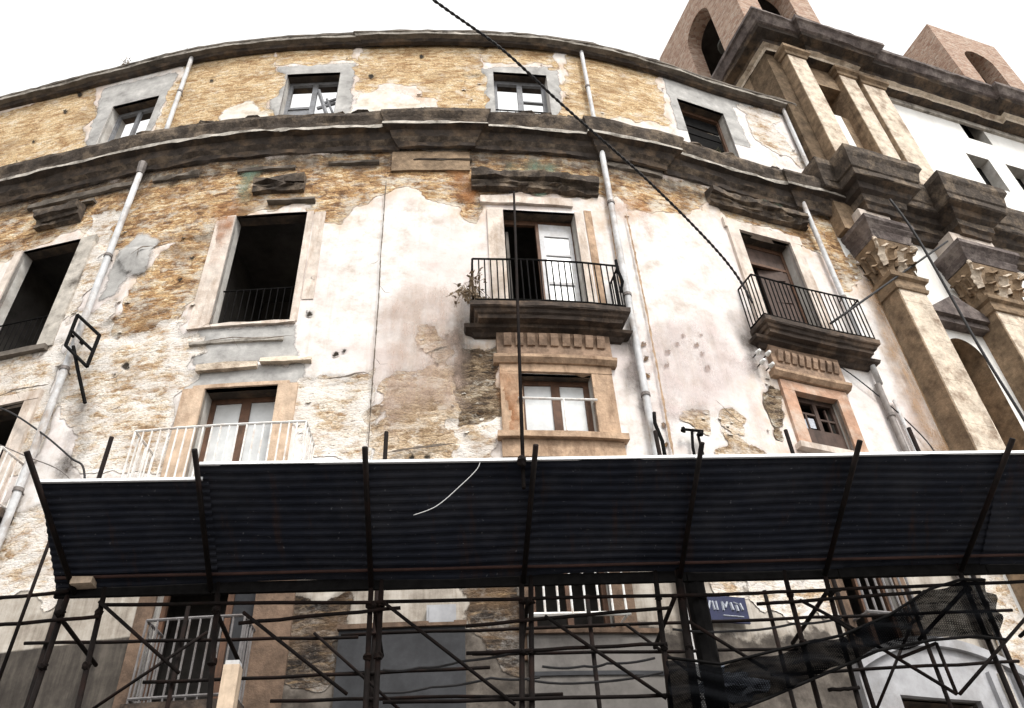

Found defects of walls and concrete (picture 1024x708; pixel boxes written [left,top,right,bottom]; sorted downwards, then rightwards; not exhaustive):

spalling [0,88,98,167]
spalling [155,45,671,130]
flaking render [737,104,806,168]
spalling [720,209,863,293]
spalling [0,149,710,476]
flaking render [680,408,766,455]
spalling [763,376,785,441]
spalling [284,591,354,692]